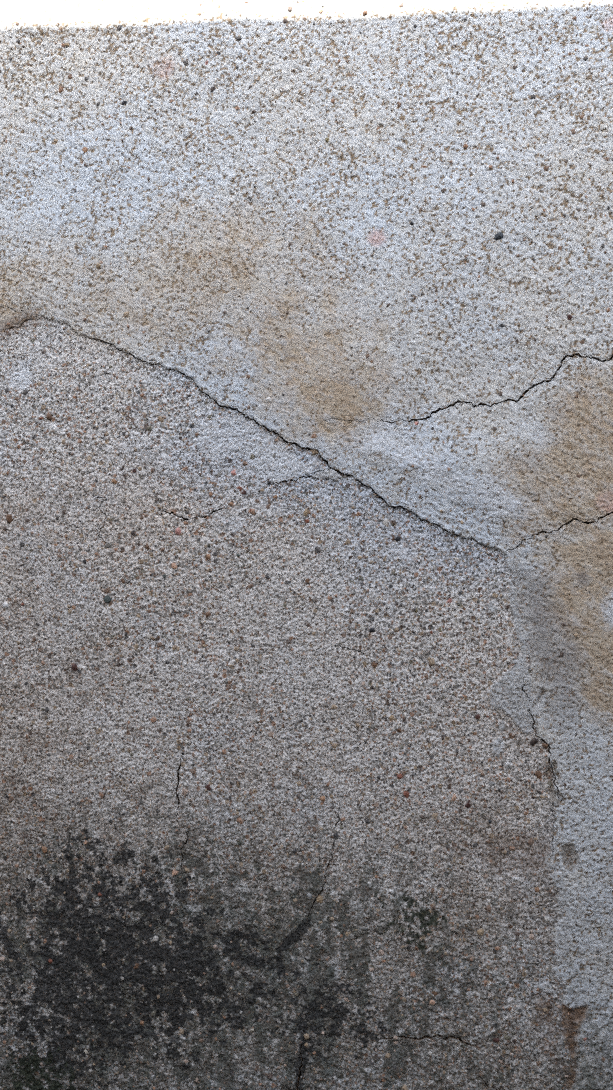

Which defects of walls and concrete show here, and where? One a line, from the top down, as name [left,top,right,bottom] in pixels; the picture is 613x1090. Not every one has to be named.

crack [0,305,613,556]
spalling [0,307,583,1090]
crack [336,644,363,654]
crack [520,685,562,862]
leakage [0,800,403,1090]